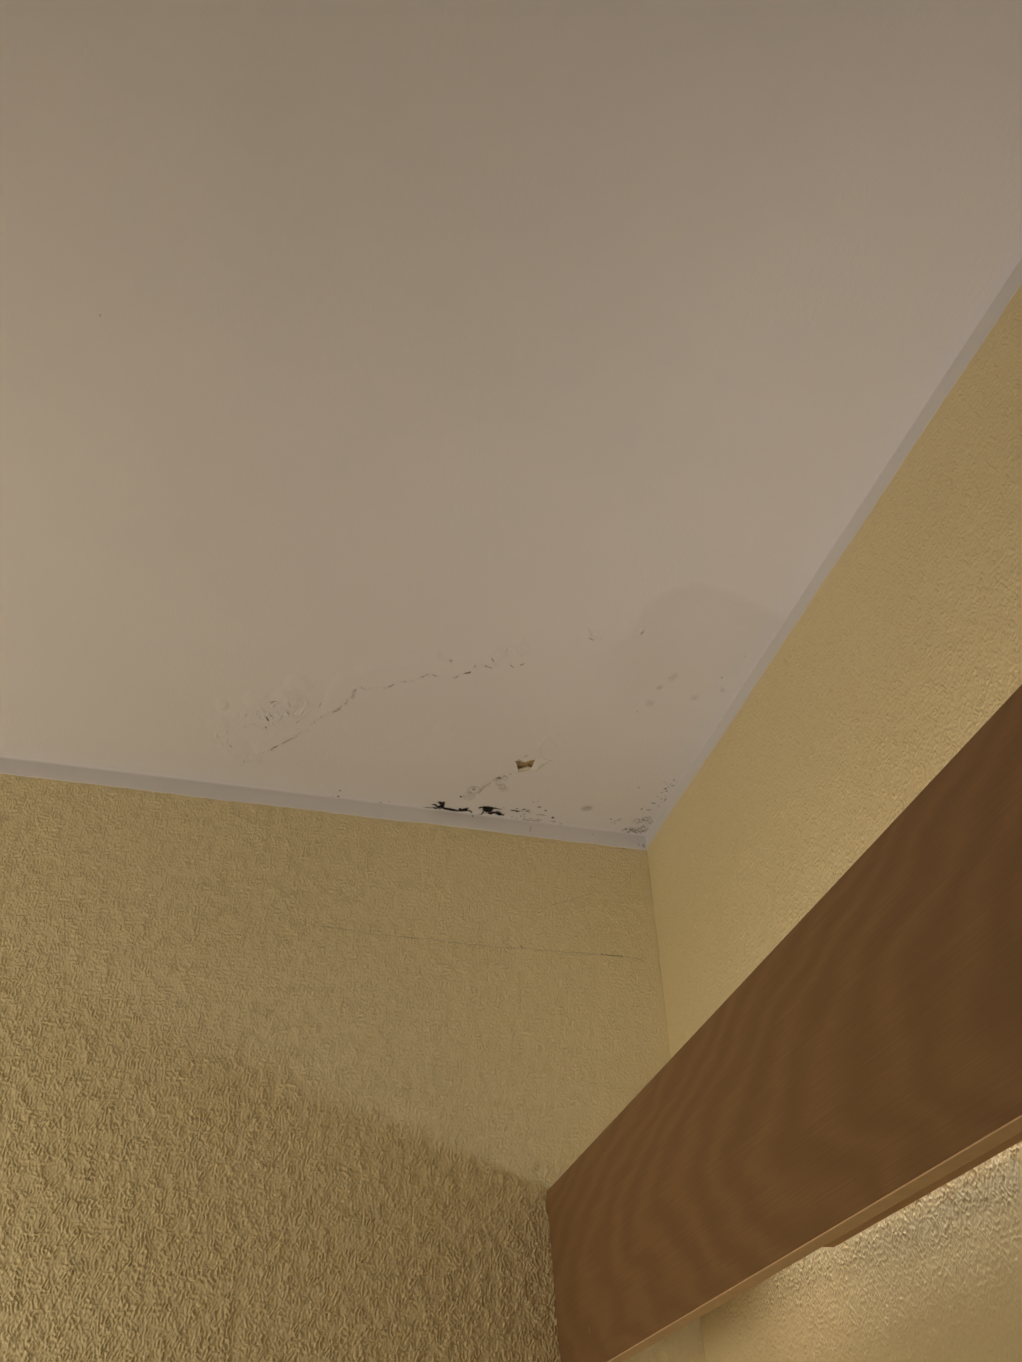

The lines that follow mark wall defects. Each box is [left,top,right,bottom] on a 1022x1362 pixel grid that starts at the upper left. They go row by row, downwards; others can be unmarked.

water stain [425,789,554,822]